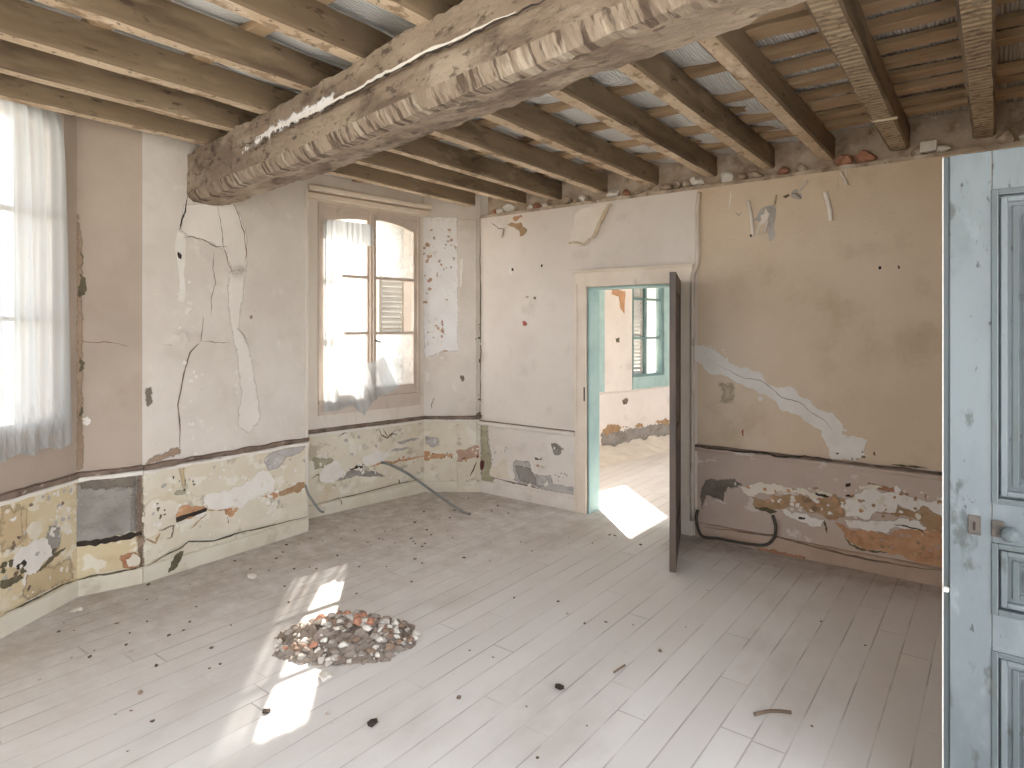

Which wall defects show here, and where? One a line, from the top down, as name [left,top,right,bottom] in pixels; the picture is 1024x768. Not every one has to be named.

peeling [569,204,611,246]
peeling [729,180,808,242]
crack [164,195,248,455]
peeling [423,217,463,381]
spalling [602,418,669,436]
crack [717,365,829,426]
peeling [0,495,72,600]
peeling [142,426,479,539]
spalling [734,482,942,568]